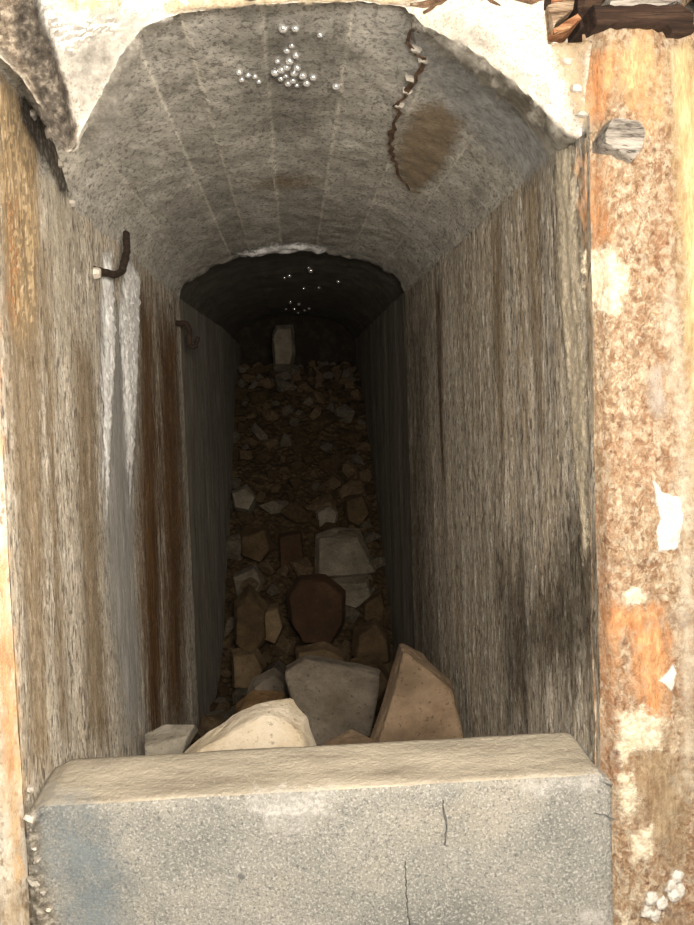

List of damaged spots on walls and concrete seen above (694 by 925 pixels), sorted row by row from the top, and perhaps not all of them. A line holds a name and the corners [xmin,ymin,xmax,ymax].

crack [410,0,447,44]
crack [488,0,543,8]
spalling [0,0,77,207]
corrosion [586,40,653,120]
corrosion [671,46,694,351]
corrosion [605,605,669,718]
efflorescence [612,704,669,824]
crack [441,800,449,845]
efflorescence [630,824,653,862]
efflorescence [641,870,685,922]